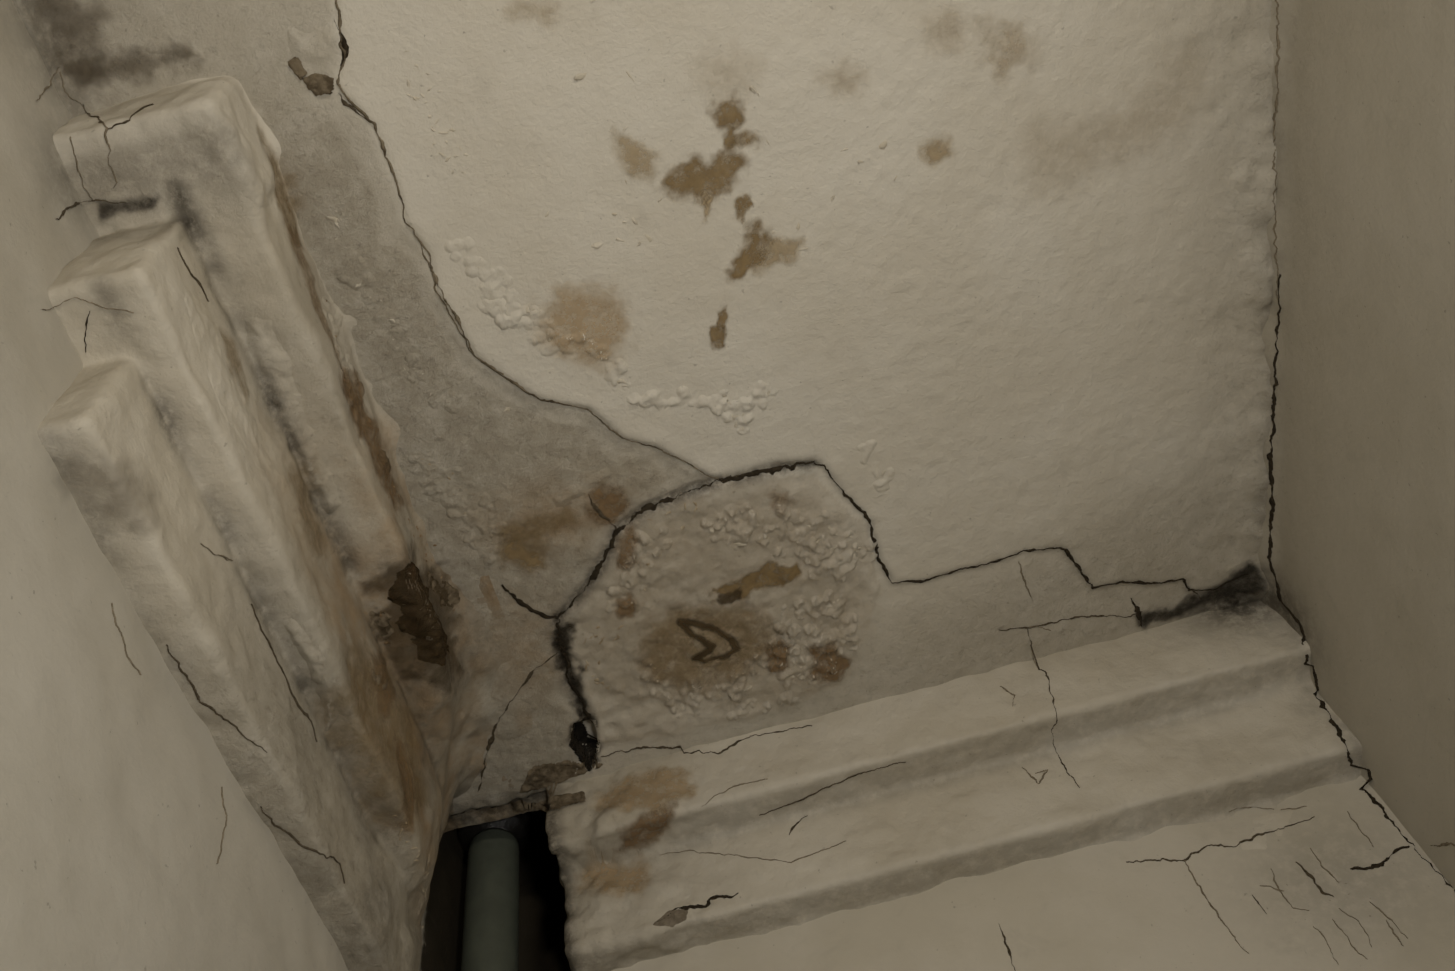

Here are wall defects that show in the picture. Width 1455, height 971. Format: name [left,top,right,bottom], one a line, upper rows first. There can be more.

peeling [287,20,342,96]
damp [664,102,799,279]
damp [710,309,728,348]
crack [334,0,1455,892]
crack [111,603,267,753]
crack [251,604,317,742]
spalling [364,519,460,666]
damp [617,596,635,617]
damp [649,562,800,685]
damp [810,644,849,681]
crack [217,786,345,884]
crack [1126,816,1315,954]